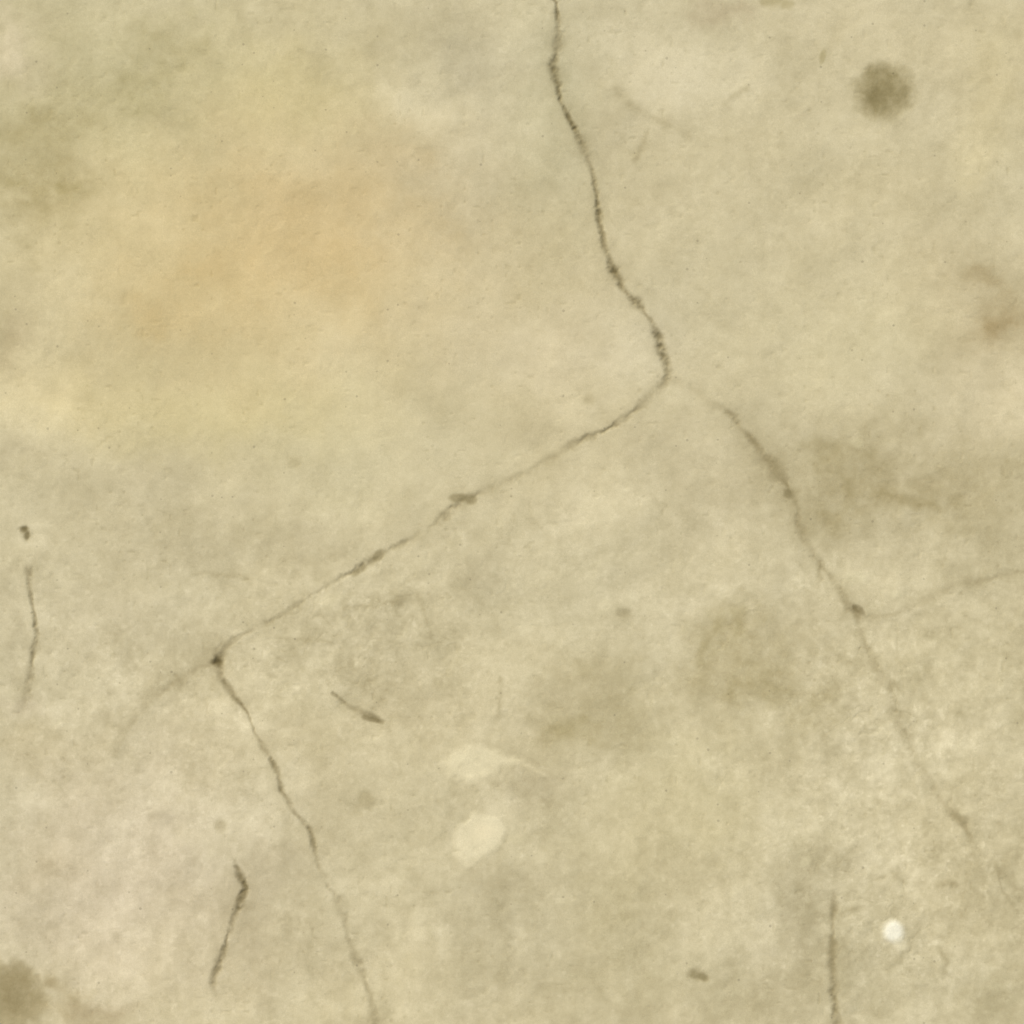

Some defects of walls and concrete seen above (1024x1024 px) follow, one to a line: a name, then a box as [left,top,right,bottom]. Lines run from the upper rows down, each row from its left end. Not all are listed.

crack [719,82,753,108]
damp [845,55,923,126]
crack [109,0,695,1024]
crack [10,556,52,722]
crack [666,371,1024,916]
crack [814,888,877,1024]
crack [934,942,953,978]